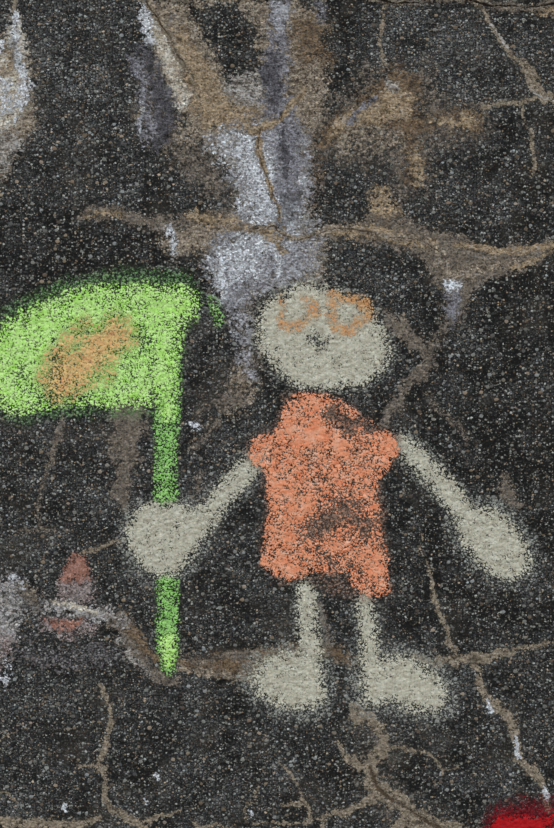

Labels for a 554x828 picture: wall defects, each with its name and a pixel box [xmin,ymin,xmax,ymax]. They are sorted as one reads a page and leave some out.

crack [138,0,202,103]
crack [247,85,554,271]
crack [368,0,554,178]
crack [78,537,126,555]
crack [0,683,465,828]
crack [411,533,554,814]